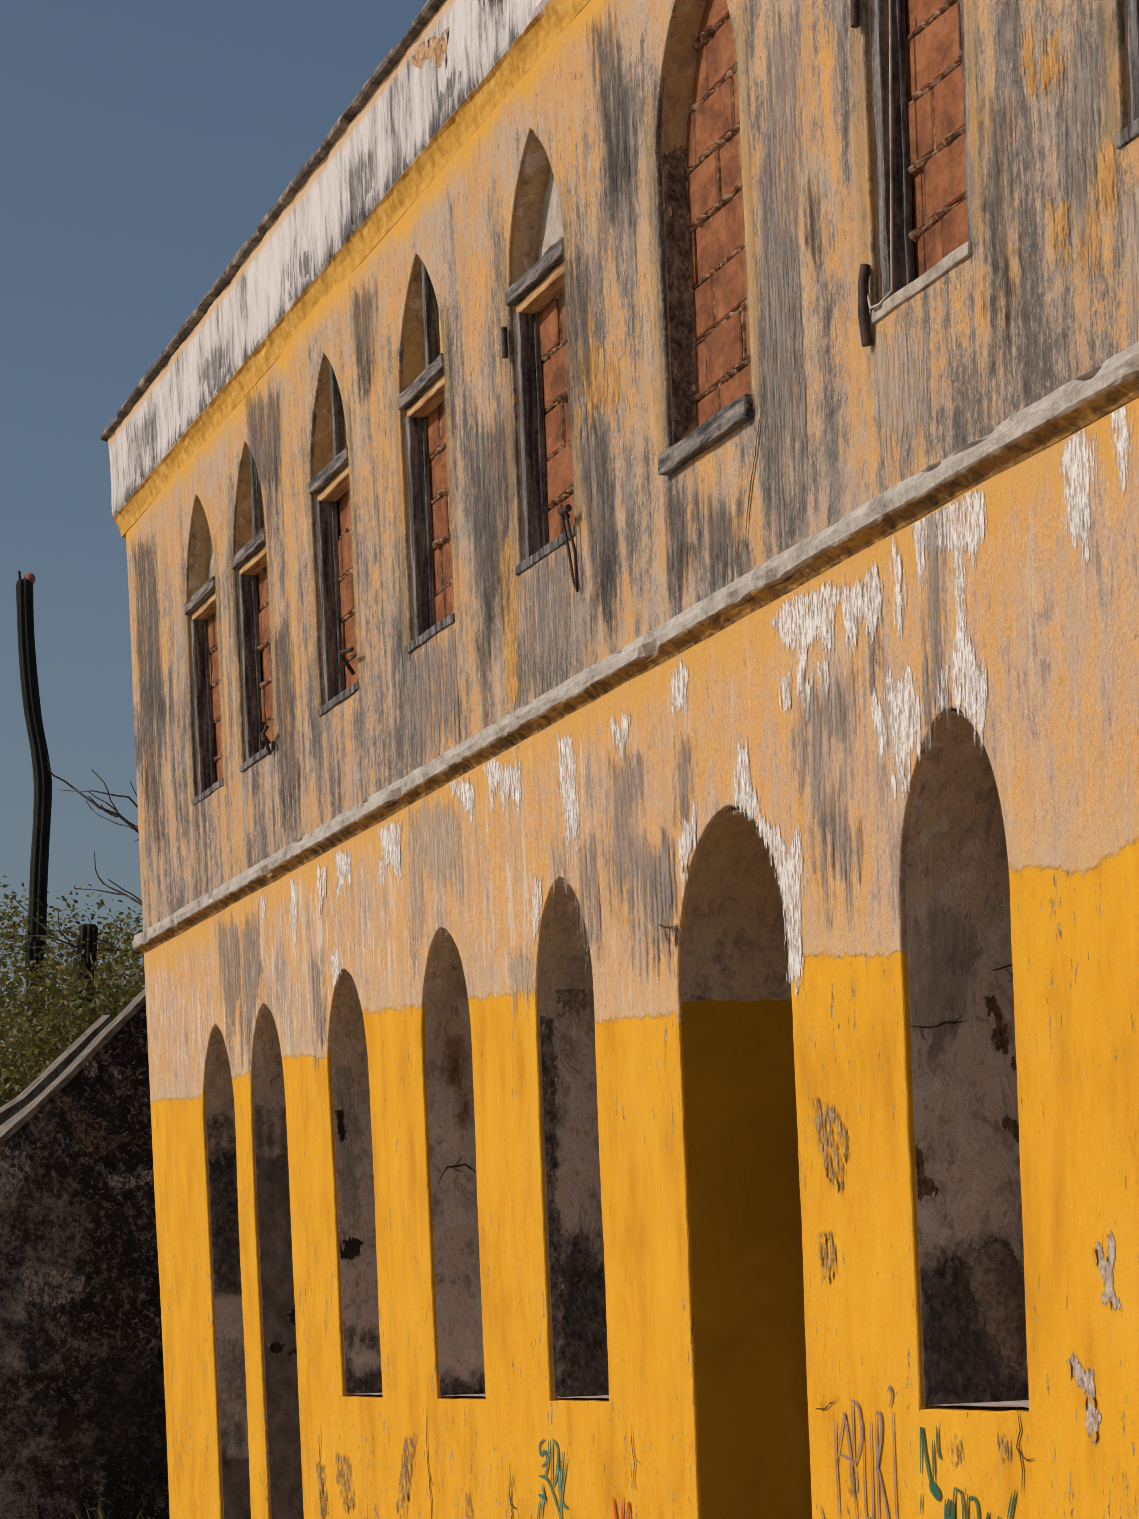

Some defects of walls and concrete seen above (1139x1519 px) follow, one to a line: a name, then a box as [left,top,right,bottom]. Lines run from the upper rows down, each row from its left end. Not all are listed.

spalling [411,27,449,68]
leakage [470,15,637,722]
leakage [751,1,819,551]
peeling [1059,406,1133,564]
leakage [132,535,166,859]
peeling [771,485,987,800]
leakage [574,732,696,977]
peeling [733,738,803,996]
leakage [549,1234,609,1400]
leakage [921,1236,1028,1409]
peeling [1066,1352,1101,1447]
peeling [1092,1230,1122,1313]